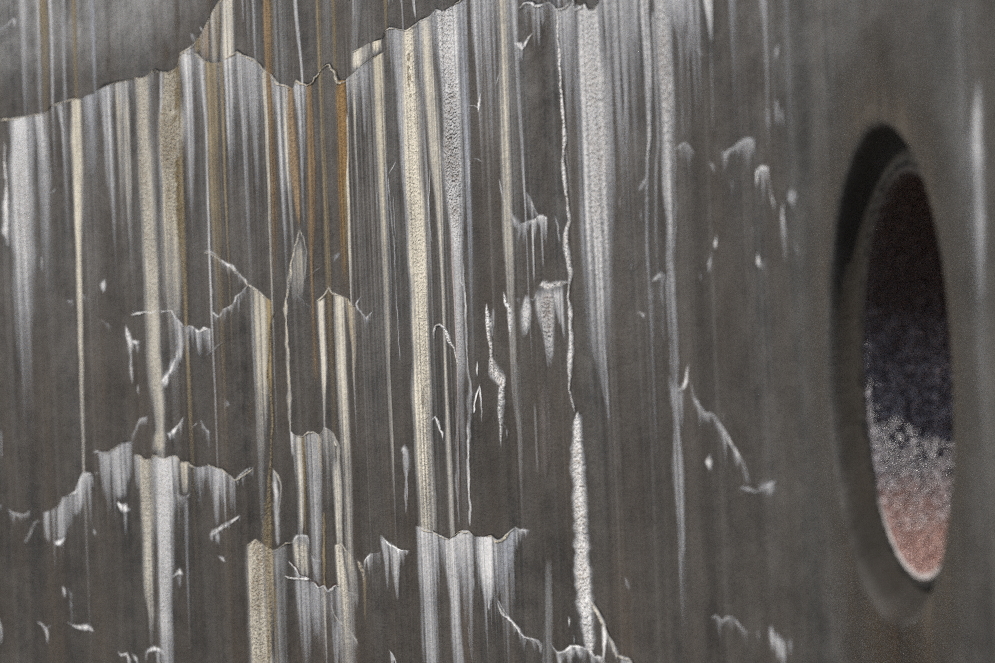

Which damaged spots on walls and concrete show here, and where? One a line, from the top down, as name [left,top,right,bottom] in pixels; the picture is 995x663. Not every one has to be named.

water stain [11,0,232,663]
crack [132,260,246,386]
water stain [182,0,272,428]
crack [0,0,461,239]
corrosion [262,0,281,549]
water stain [247,231,371,663]
corrosion [287,0,351,347]
water stain [346,0,568,652]
crack [519,0,599,409]
crack [498,601,633,663]
water stain [572,412,593,654]
water stain [532,0,712,364]